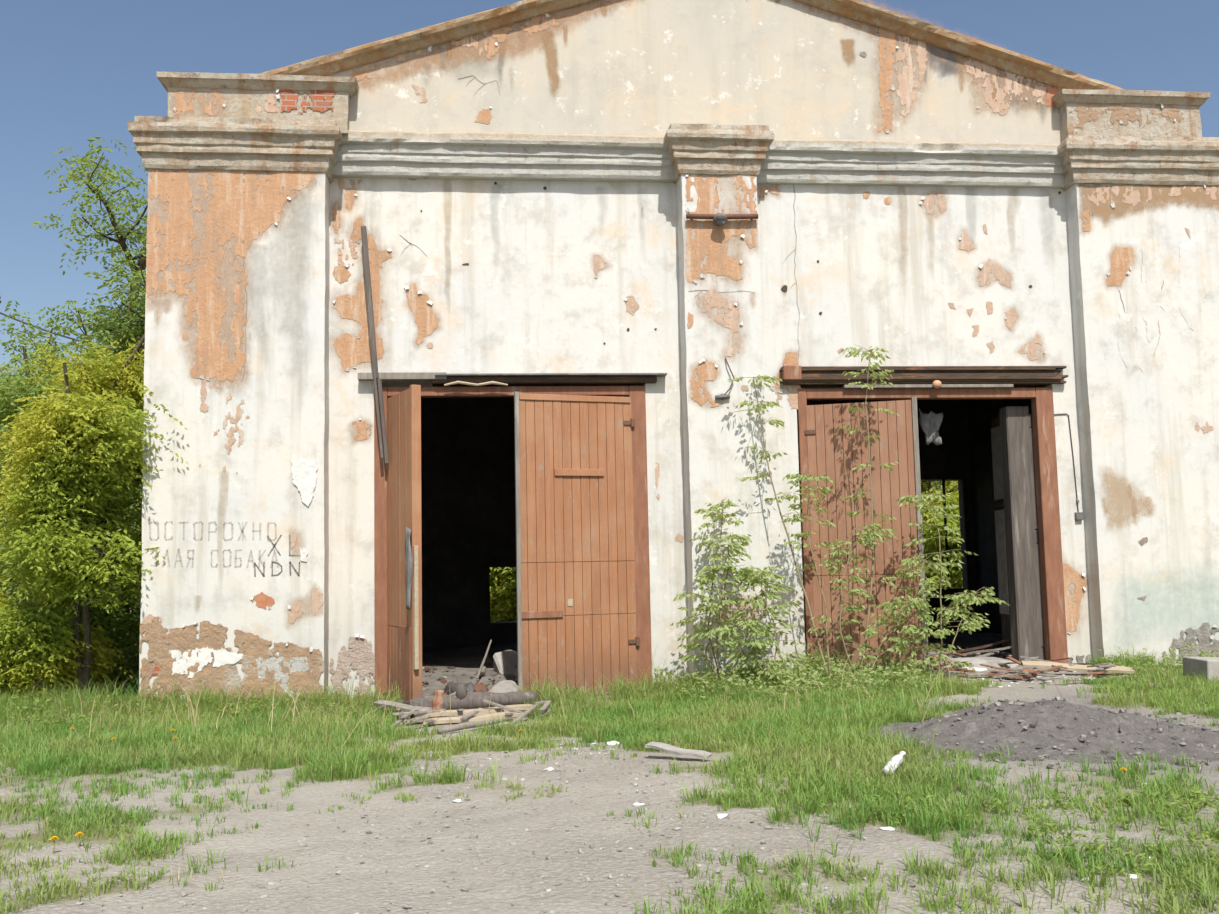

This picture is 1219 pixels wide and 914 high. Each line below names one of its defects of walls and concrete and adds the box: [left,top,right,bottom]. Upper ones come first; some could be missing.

water stain [543,32,559,92]
peeling [878,28,928,133]
peeling [964,58,1061,115]
peeling [1081,184,1217,231]
peeling [146,168,317,474]
peeling [332,177,392,371]
peeling [404,284,439,349]
peeling [685,174,779,407]
peeling [948,302,1019,354]
peeling [1106,246,1134,286]
spalling [138,614,375,706]
spalling [1147,622,1219,666]